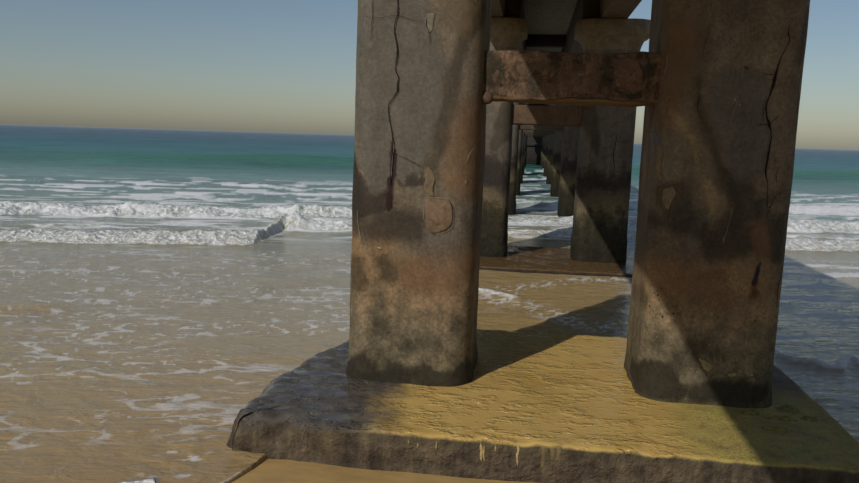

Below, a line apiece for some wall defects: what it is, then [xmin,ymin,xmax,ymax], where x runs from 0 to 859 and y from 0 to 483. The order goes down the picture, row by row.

crack [370,0,430,185]
peeling [356,0,453,232]
crack [756,25,801,222]